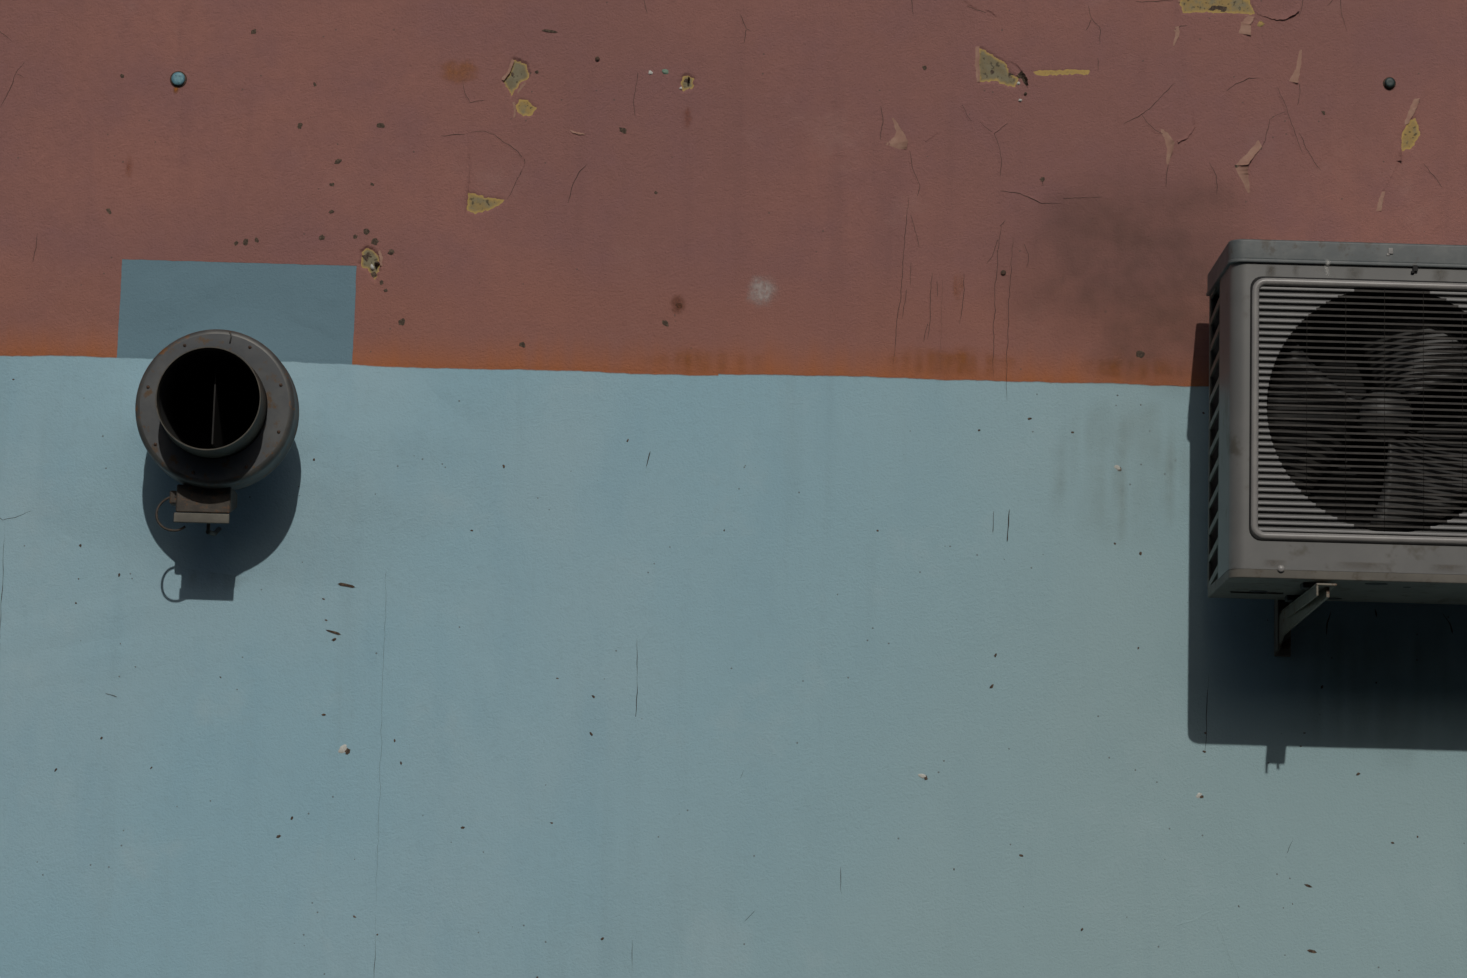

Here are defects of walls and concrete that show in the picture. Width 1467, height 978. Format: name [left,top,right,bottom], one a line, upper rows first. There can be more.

peeling [1136,0,1303,46]
spalling [501,59,539,118]
spalling [974,46,1028,102]
peeling [441,130,525,214]
peeling [1235,118,1270,193]
peeling [1376,98,1420,211]
crack [892,177,1103,402]